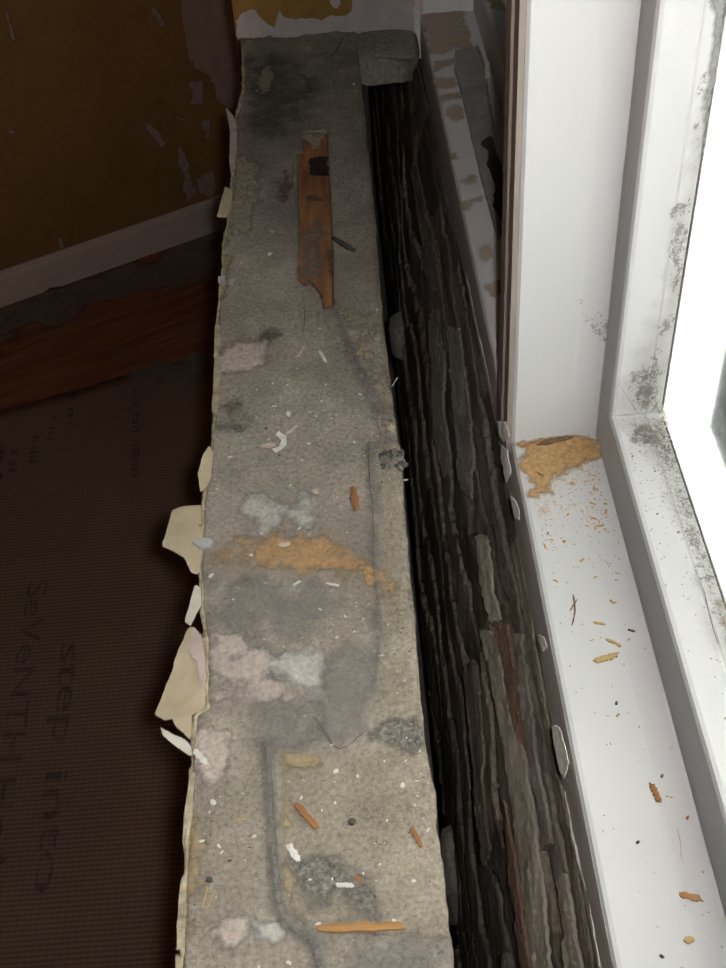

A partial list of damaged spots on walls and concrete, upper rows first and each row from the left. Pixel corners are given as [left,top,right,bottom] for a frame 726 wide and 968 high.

peeling [180,0,415,176]
damp [694,0,726,152]
peeling [217,186,233,218]
damp [668,199,690,300]
peeling [198,446,213,491]
damp [630,314,726,626]
peeling [155,505,214,756]